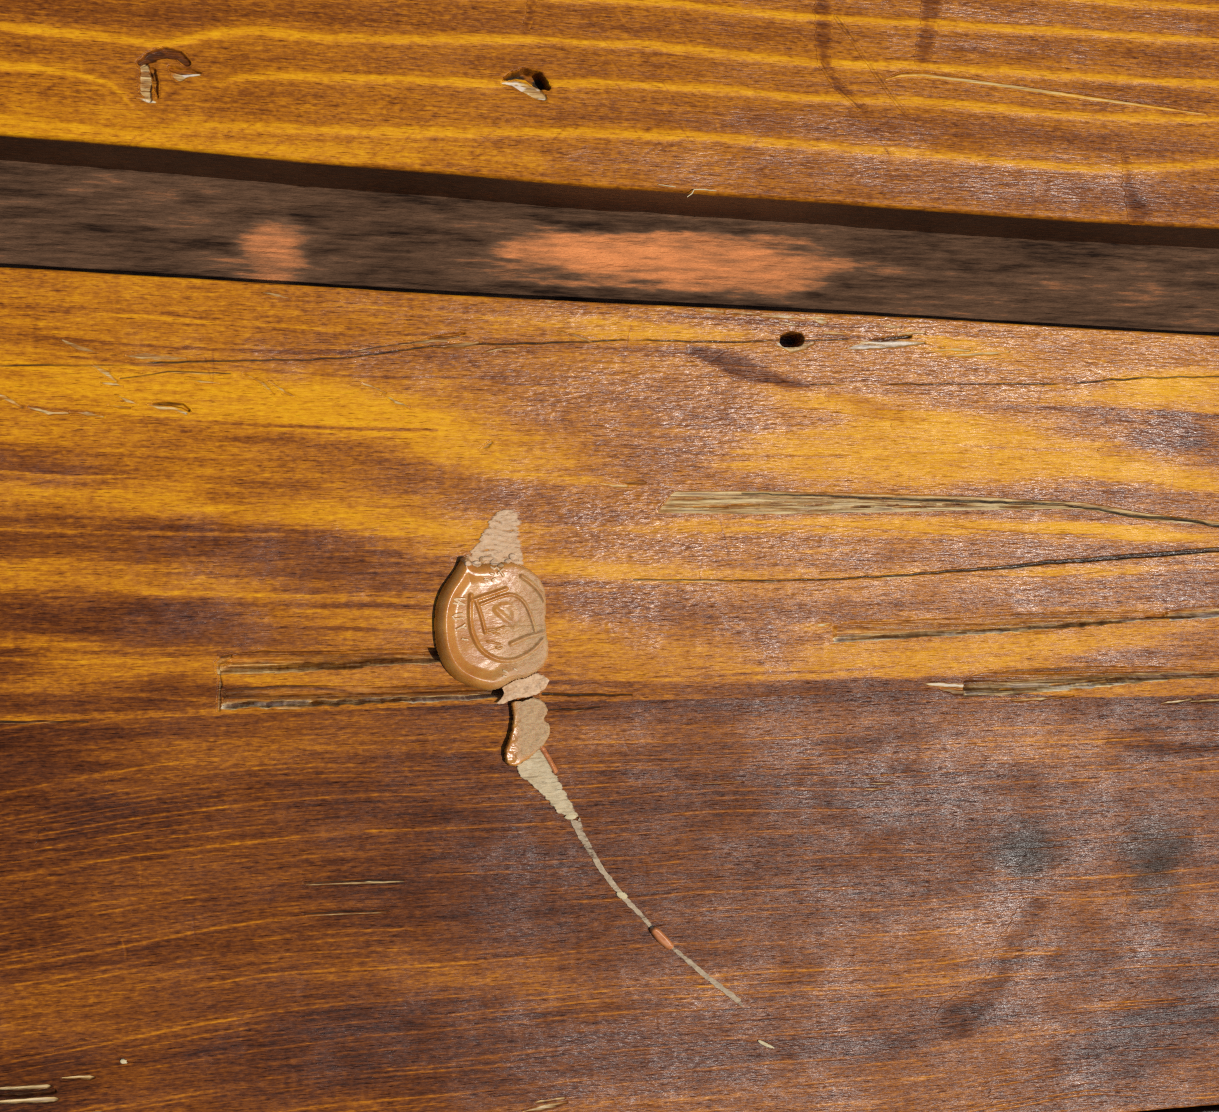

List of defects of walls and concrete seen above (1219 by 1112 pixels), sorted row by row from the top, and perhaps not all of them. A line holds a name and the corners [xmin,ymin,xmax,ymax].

crack [630,545,1219,585]
peeling [650,926,674,950]
spalling [0,1074,97,1106]